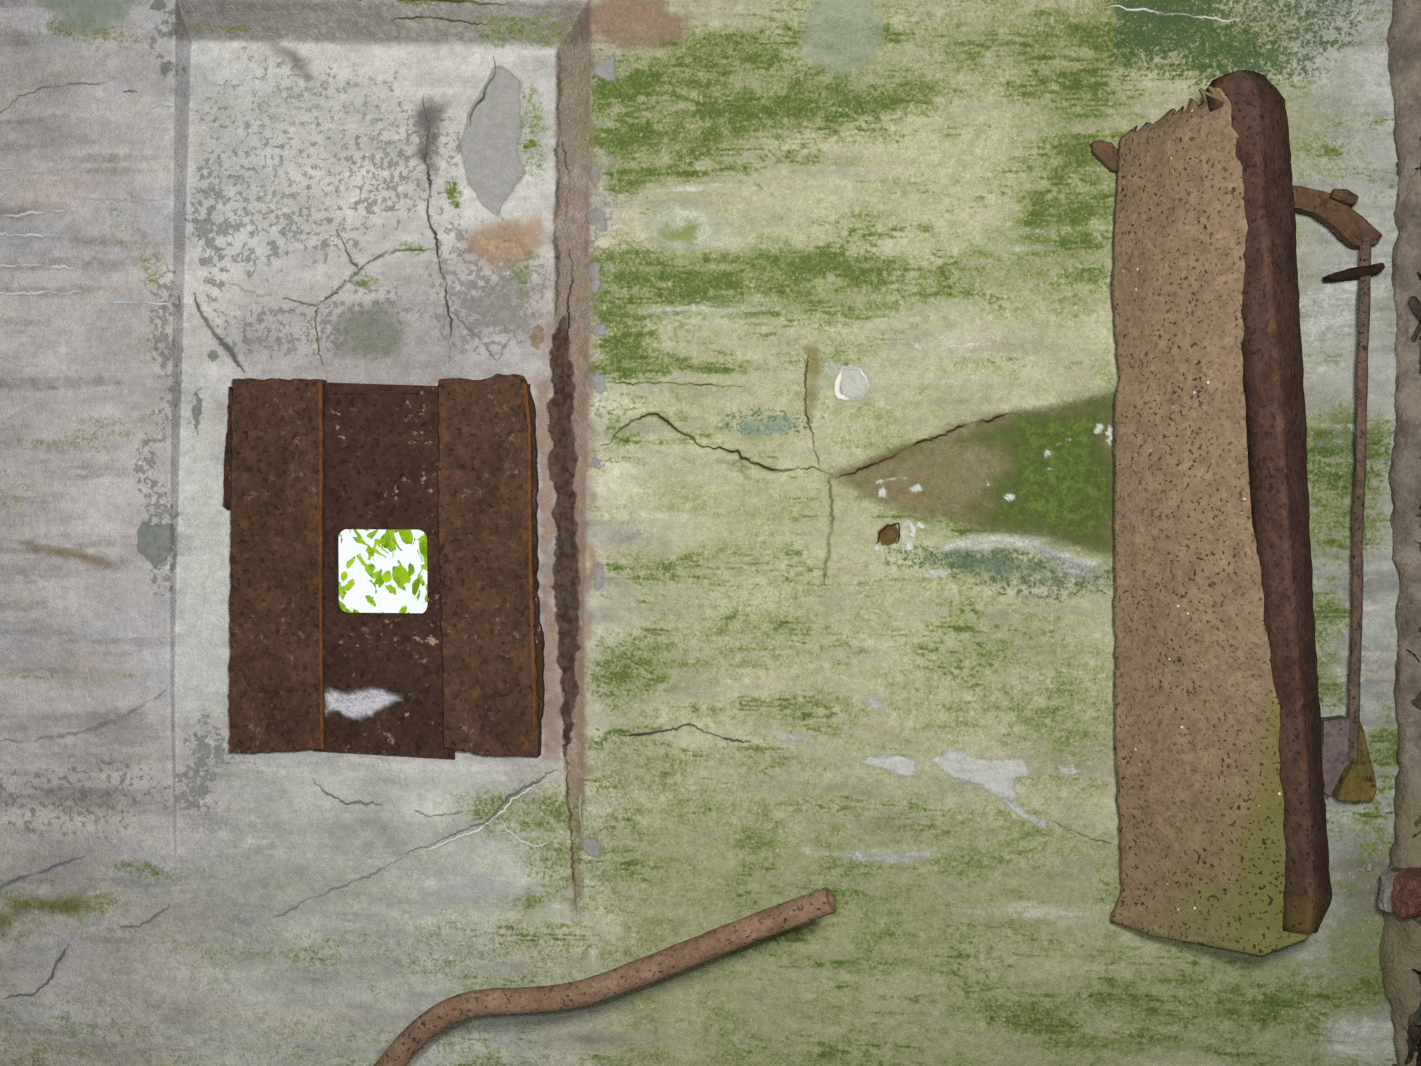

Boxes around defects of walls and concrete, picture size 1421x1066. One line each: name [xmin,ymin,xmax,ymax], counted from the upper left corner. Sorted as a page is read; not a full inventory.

crack [391,0,510,25]
crack [1106,5,1241,22]
crack [469,61,496,125]
spalling [461,66,526,215]
crack [194,94,511,373]
corrosion [470,55,580,764]
crack [603,348,1026,586]
peeling [860,748,1046,829]
peeling [1056,764,1080,775]
crack [0,856,85,890]
crack [275,768,582,917]